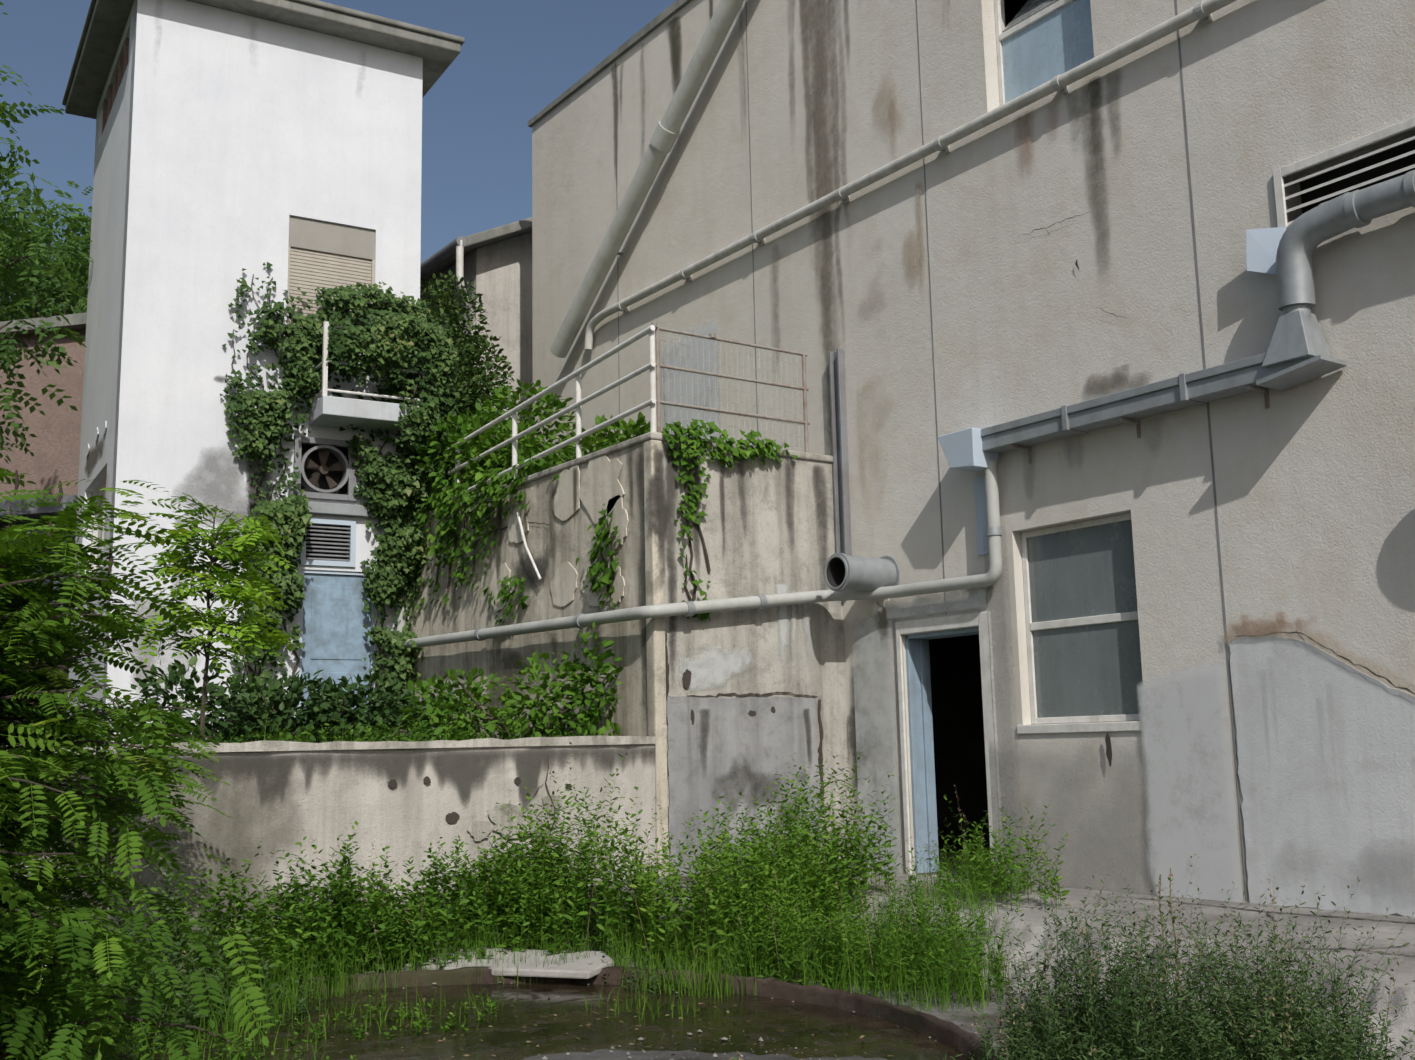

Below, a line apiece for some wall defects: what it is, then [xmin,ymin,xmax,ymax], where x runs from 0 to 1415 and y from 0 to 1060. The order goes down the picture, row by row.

leakage [791,0,841,328]
leakage [1086,365,1146,392]
peeling [508,505,529,543]
peeling [550,455,629,607]
peeling [489,563,511,612]
leakage [701,710,709,755]
leakage [42,747,656,942]